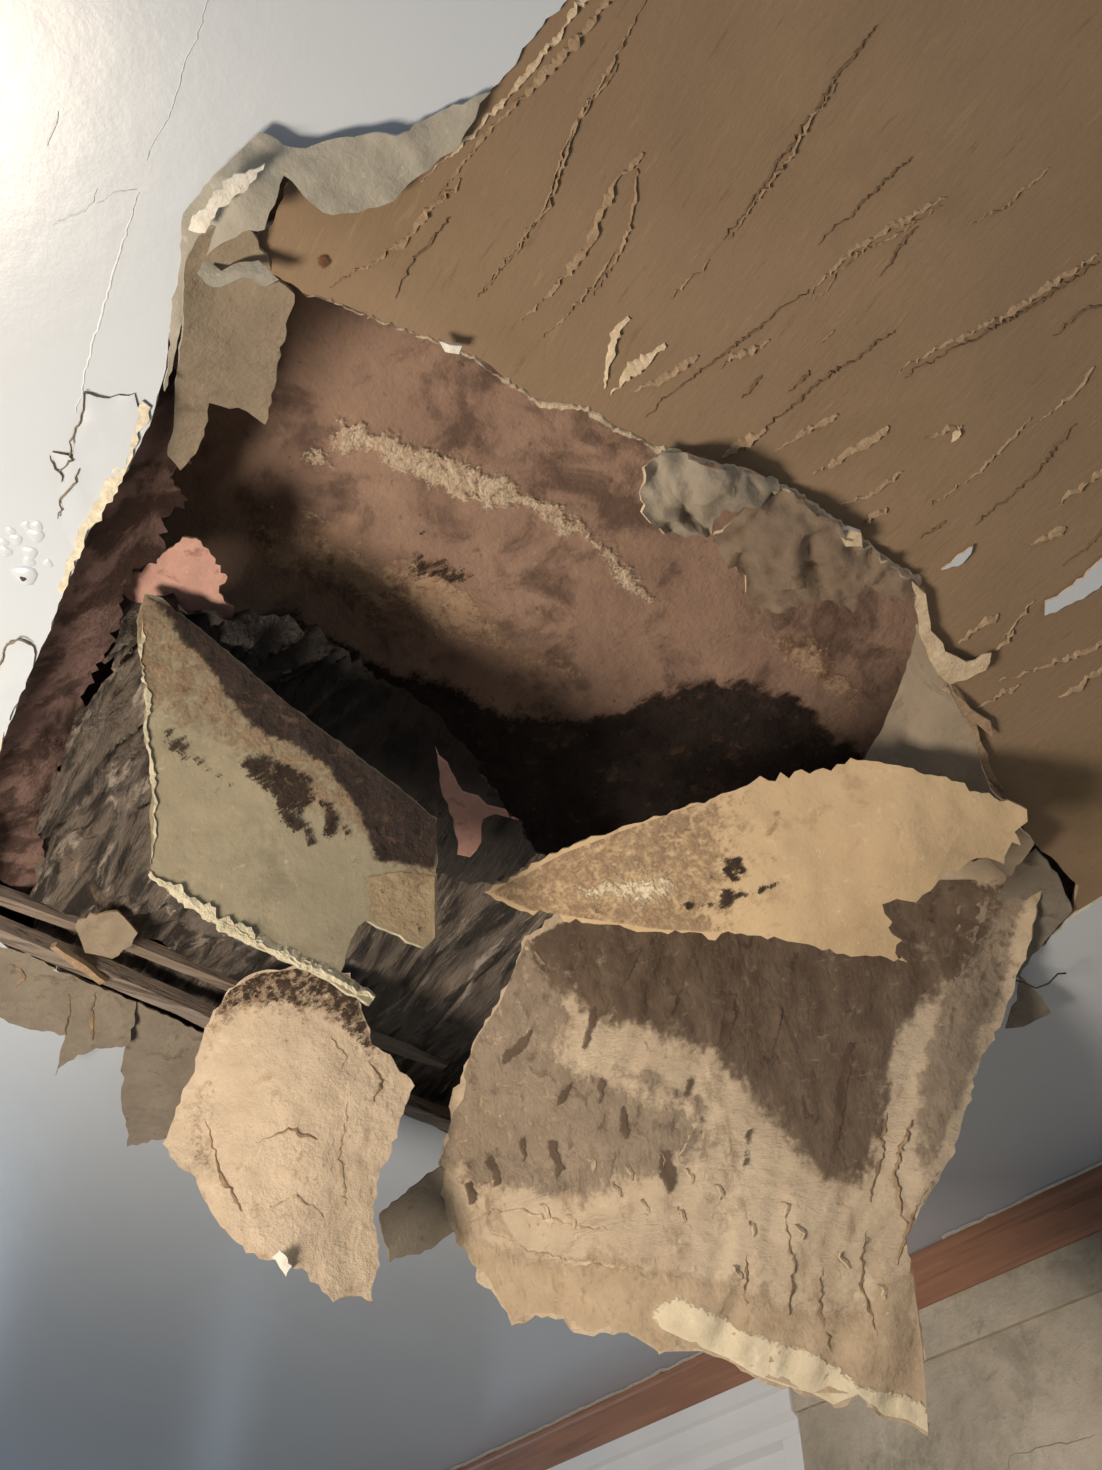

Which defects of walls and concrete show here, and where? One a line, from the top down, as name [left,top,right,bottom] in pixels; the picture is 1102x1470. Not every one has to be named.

crack [53,0,208,413]
peeling [163,92,490,471]
peeling [50,392,151,594]
damp [301,419,654,604]
flaking render [840,526,862,547]
peeling [0,638,35,752]
damp [137,596,436,945]
damp [215,969,379,1060]
damp [327,637,1023,1208]
peeling [271,1249,292,1276]
damp [455,1228,927,1431]
peeling [941,1162,1102,1239]